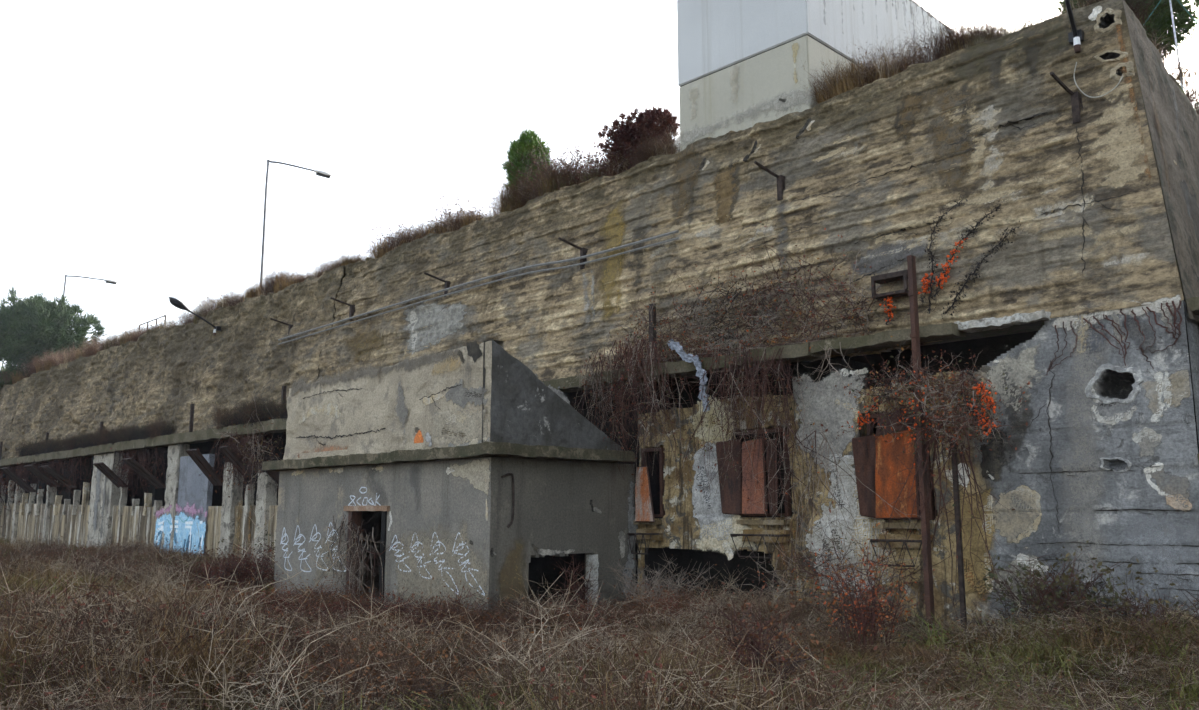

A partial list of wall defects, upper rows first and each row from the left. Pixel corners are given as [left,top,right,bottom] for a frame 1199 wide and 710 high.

damp [672,91,810,225]
crack [725,112,1047,256]
crack [1041,127,1138,274]
crack [296,428,386,446]
peeling [692,395,734,541]
spalling [1085,363,1192,512]